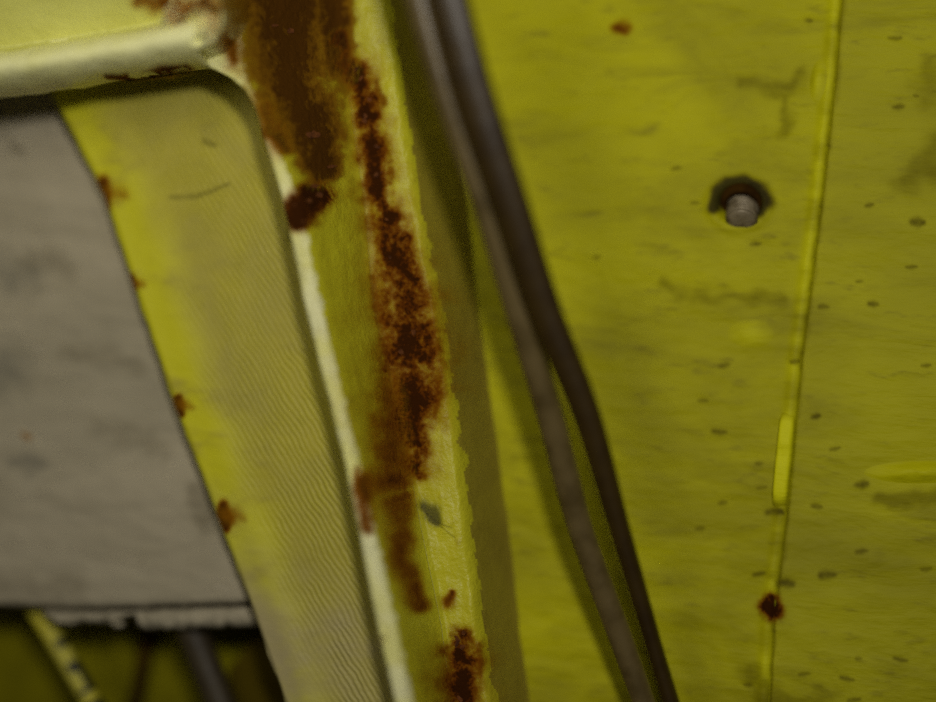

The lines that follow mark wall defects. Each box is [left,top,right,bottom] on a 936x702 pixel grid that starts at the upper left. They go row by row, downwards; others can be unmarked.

rust [97,175,124,209]
rust [133,0,443,613]
rust [442,589,456,608]
rust [757,592,784,621]
rust [436,628,484,702]